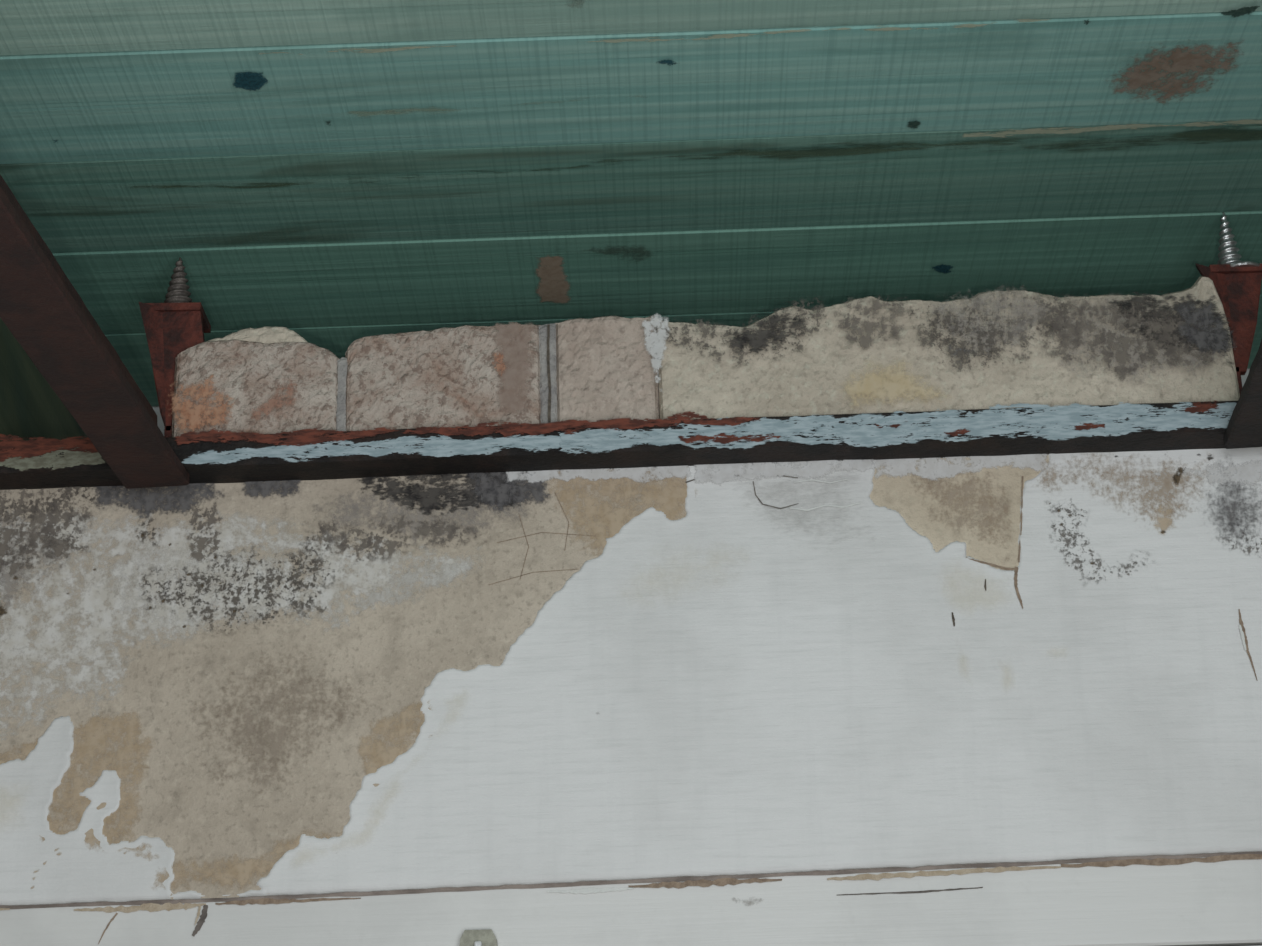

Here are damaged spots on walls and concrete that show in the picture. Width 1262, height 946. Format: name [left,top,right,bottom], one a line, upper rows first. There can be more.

rust [1113,43,1239,103]
water stain [663,288,1235,380]
water stain [0,459,875,630]
flaking render [870,454,1049,570]
water stain [1049,503,1144,581]
water stain [1091,461,1262,553]
flaking render [0,466,688,936]